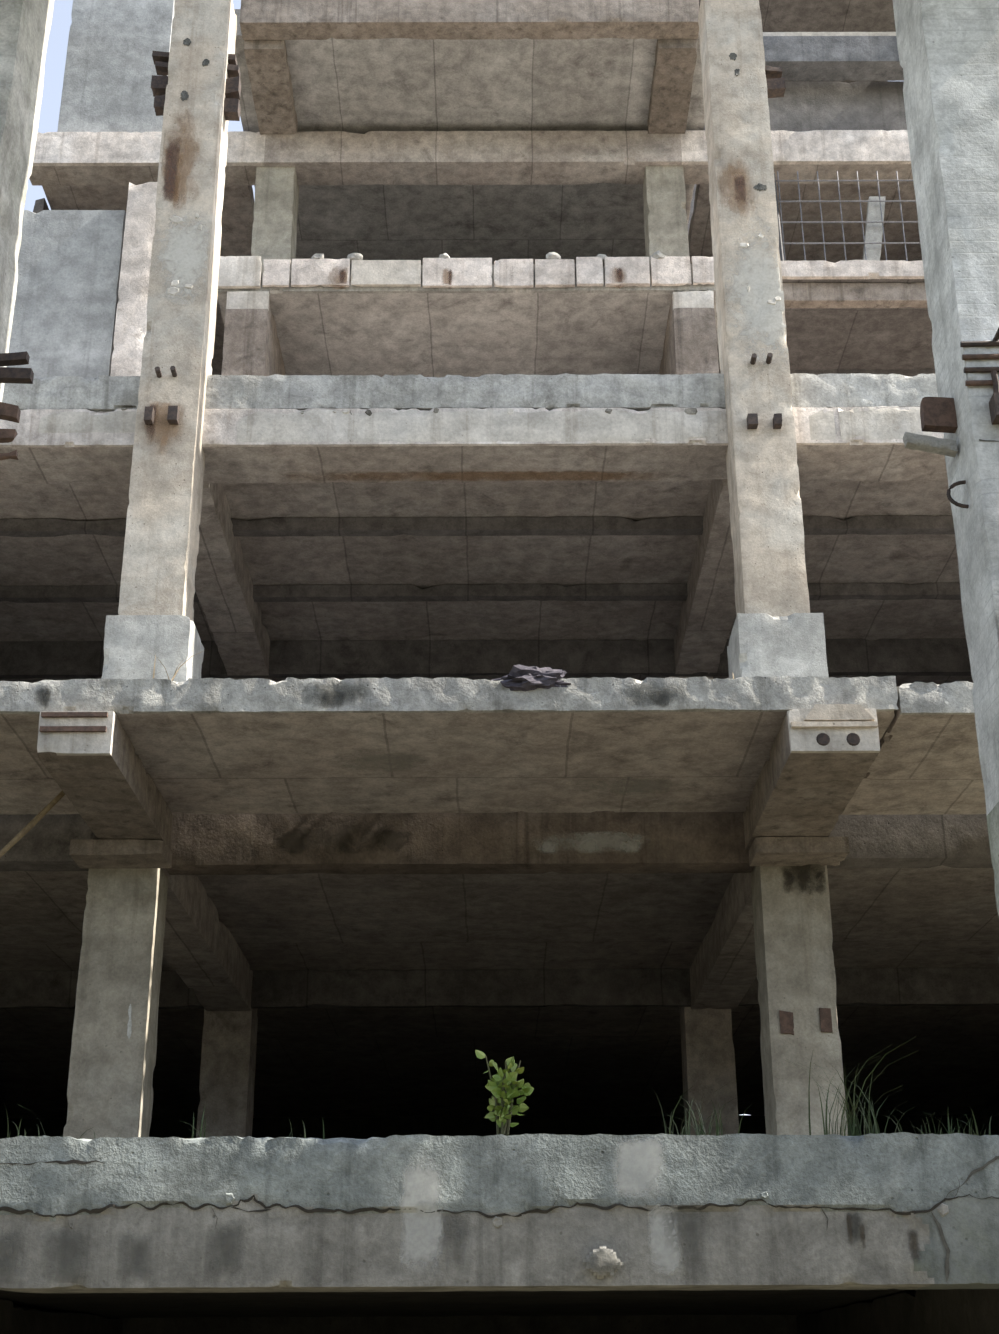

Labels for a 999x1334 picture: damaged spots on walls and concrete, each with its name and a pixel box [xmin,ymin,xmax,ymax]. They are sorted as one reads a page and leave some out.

corrosion [164,139,194,200]
corrosion [728,168,746,210]
crack [0,1156,999,1282]